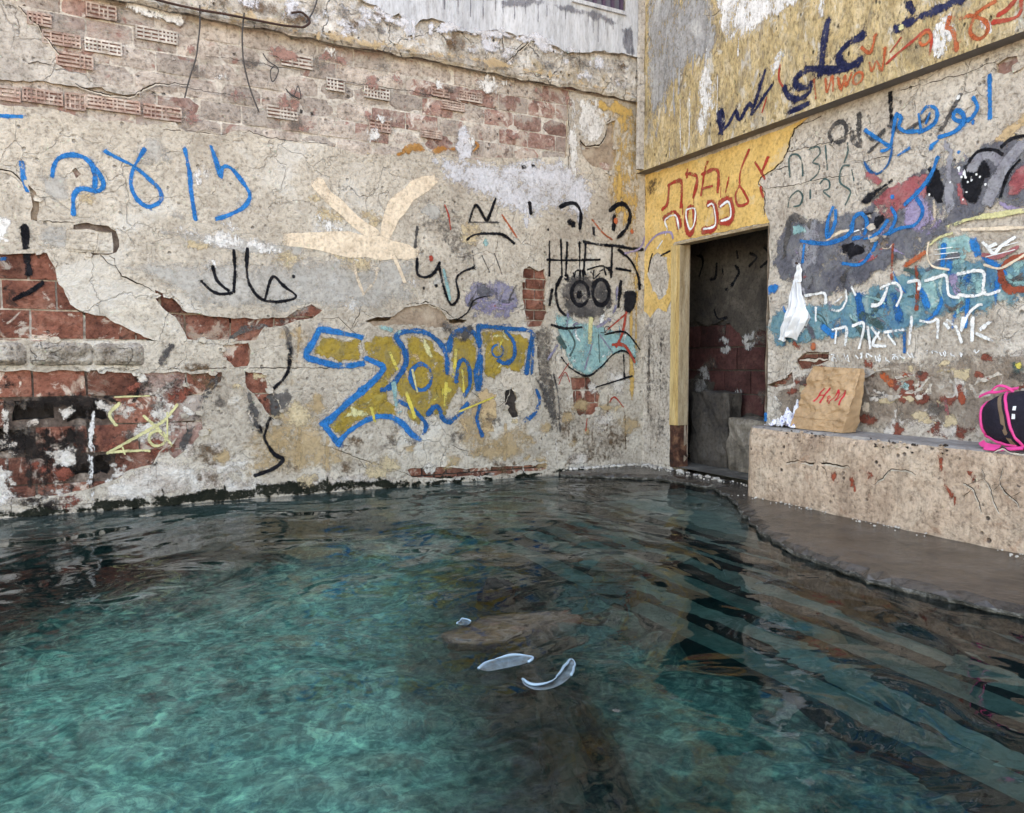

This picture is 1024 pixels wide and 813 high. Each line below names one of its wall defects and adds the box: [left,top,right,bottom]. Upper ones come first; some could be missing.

peeling [717,0,797,57]
crack [0,169,69,194]
flaking render [0,217,149,343]
crack [100,255,157,293]
flaking render [520,267,548,327]
crack [206,303,372,370]
flaking render [0,290,322,499]
flaking render [773,349,829,416]
flaking render [859,350,1024,453]
damp [0,364,419,510]
crack [786,458,849,476]
crack [963,447,1024,514]